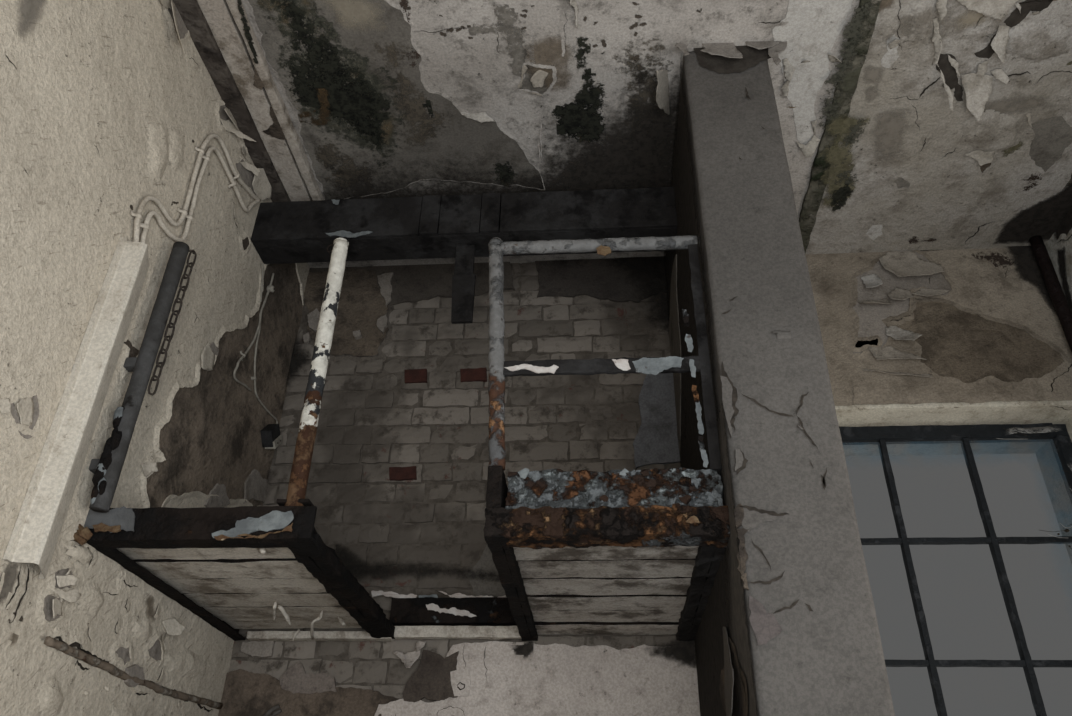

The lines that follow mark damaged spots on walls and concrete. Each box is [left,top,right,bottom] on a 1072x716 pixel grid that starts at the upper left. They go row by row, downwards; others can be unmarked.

leakage [237,0,258,64]
leakage [258,0,445,191]
peeling [245,0,545,205]
leakage [525,37,607,142]
leakage [615,2,673,120]
crack [990,71,1072,87]
spalling [328,266,395,365]
flaking render [84,263,329,538]
crack [720,362,827,490]
crack [749,539,785,584]
crack [773,600,813,614]
spalling [392,641,459,702]